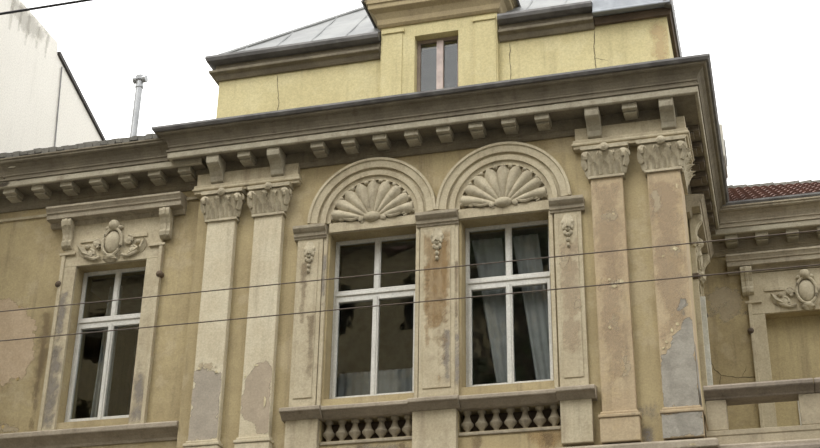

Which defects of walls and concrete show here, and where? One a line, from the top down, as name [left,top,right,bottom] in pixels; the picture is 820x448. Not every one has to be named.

peeling [0,298,37,386]
peeling [188,363,222,441]
peeling [240,361,272,434]
peeling [661,298,710,448]
crack [711,362,755,380]